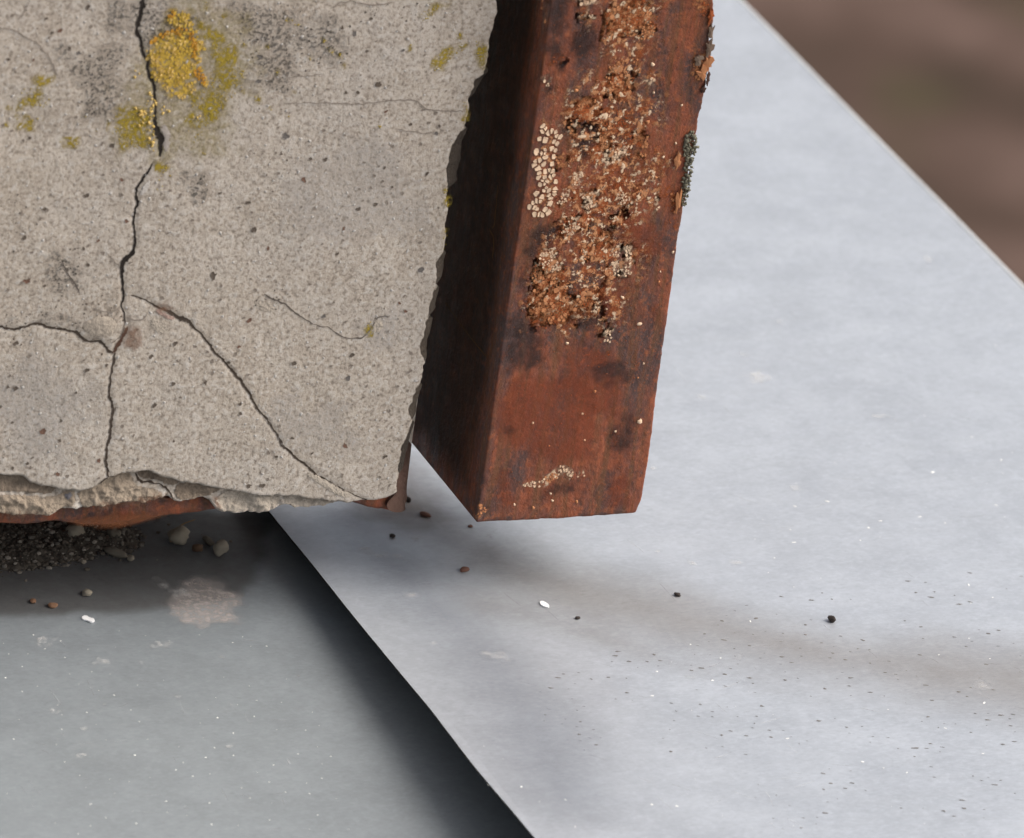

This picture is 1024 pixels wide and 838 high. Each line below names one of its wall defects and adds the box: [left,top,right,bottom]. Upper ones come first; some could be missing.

rust [694,8,715,93]
rust [528,0,660,331]
crack [0,0,366,500]
crack [265,294,389,339]
rust [76,496,160,526]
spalling [0,406,352,515]